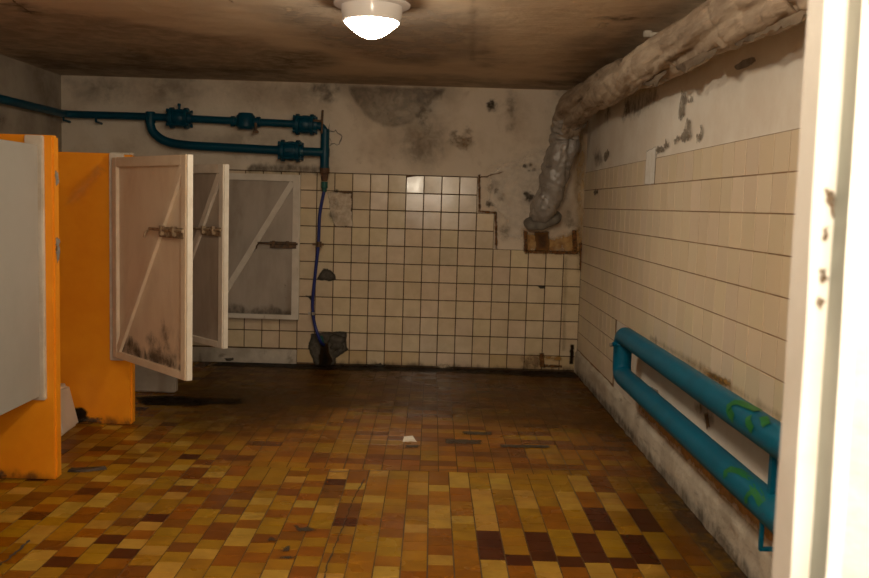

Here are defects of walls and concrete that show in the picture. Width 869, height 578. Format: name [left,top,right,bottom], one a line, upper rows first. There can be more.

damp [287,6,461,59]
peeling [656,90,702,152]
corrosion [524,223,582,270]
damp [639,405,774,545]